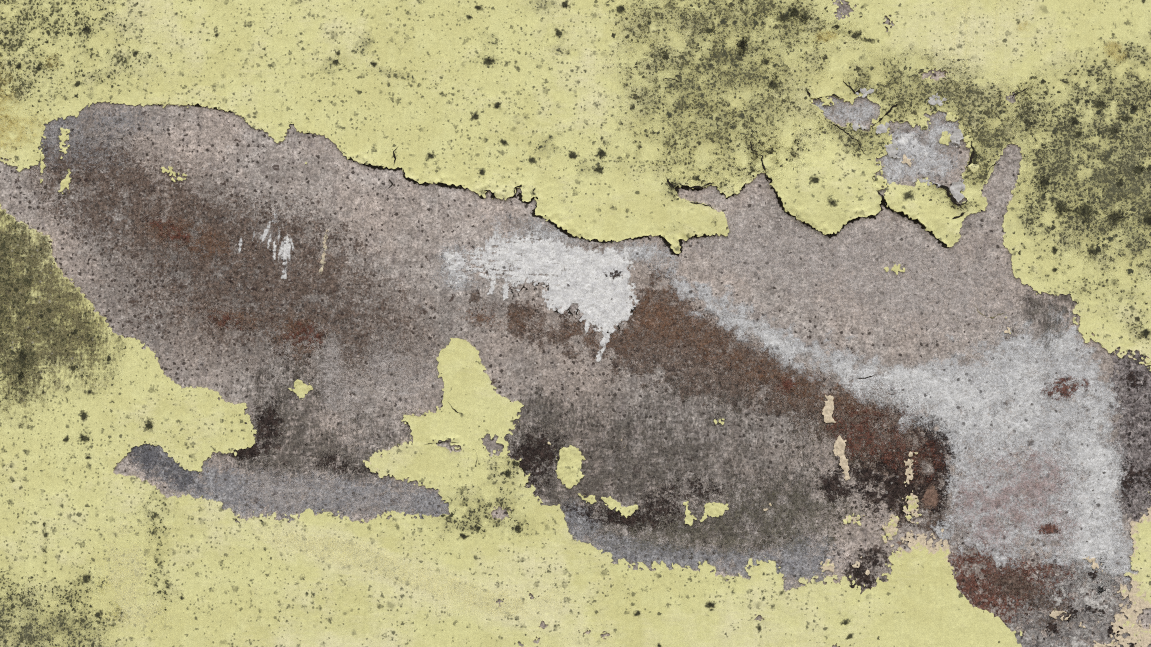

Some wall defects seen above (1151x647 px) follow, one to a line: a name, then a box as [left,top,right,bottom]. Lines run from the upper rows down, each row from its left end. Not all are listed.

water stain [0,0,151,113]
water stain [611,0,1151,276]
peeling [811,88,981,207]
water stain [0,210,126,410]
water stain [63,410,93,459]
peeling [433,438,462,453]
water stain [128,213,1151,594]
corrosion [466,268,1092,628]
peeling [963,425,1047,514]
water stain [143,491,183,614]
peeling [611,552,674,571]
spalling [973,511,1151,647]